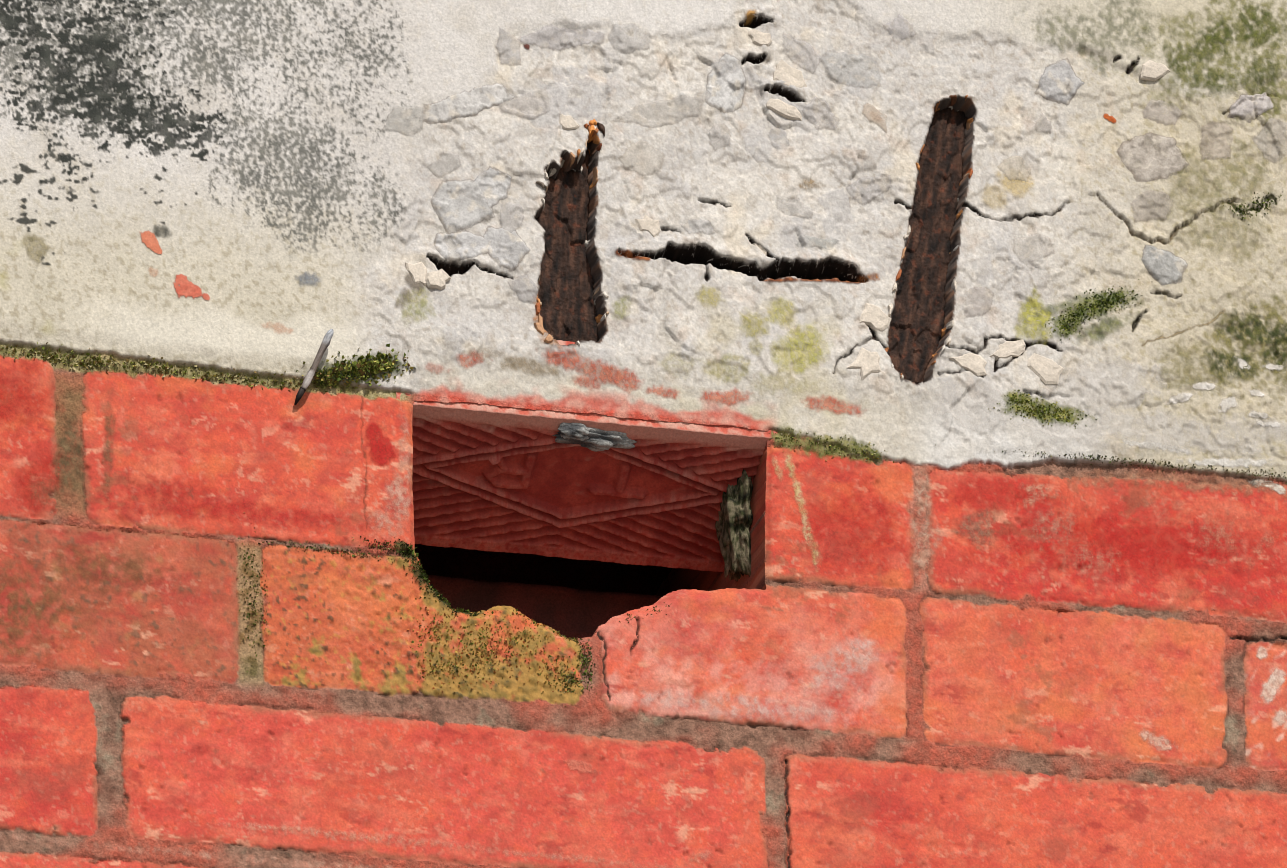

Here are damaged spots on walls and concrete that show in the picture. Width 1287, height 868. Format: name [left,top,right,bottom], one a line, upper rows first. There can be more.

damp [0,0,409,265]
crack [1097,195,1186,244]
crack [1214,194,1277,213]
damp [299,272,319,284]
crack [426,255,513,279]
spalling [357,0,1287,508]
crack [833,326,890,374]
crack [937,335,1062,400]
spalling [260,545,908,739]
crack [597,625,639,699]